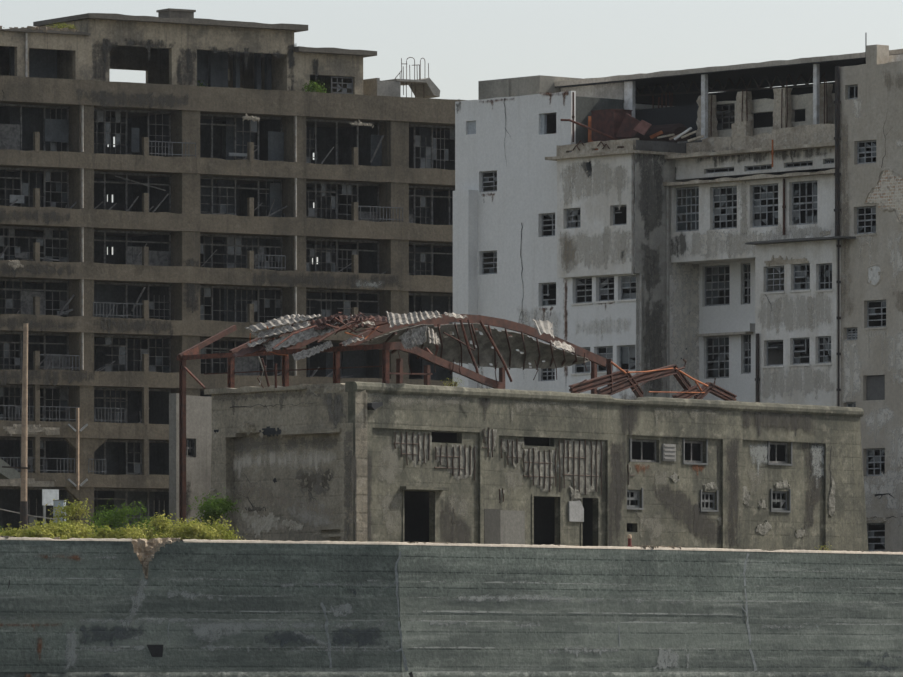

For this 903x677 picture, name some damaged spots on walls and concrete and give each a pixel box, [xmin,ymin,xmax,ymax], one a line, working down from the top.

flaking render [864,166,903,225]
water stain [636,151,670,394]
water stain [671,233,686,256]
spalling [394,427,604,501]
flaking render [241,503,304,538]
peeling [127,538,181,565]